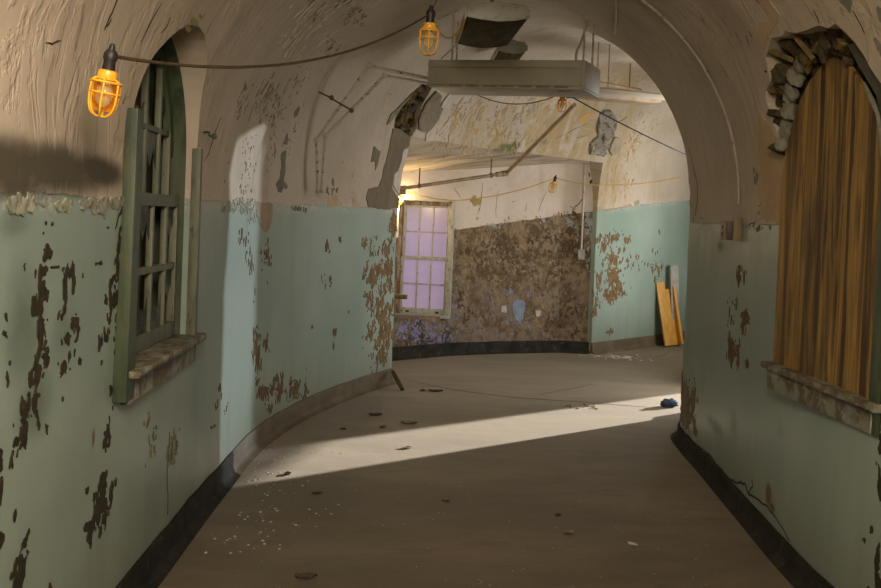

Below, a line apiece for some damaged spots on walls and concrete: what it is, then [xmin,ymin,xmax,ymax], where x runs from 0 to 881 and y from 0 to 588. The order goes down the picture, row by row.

peeling [233,66,307,193]
spalling [764,28,881,156]
spalling [6,192,124,365]
peeling [221,135,273,275]
flaking render [326,84,663,373]
peeling [0,221,84,506]
peeling [102,385,114,453]
peeling [251,324,309,414]
peeling [680,370,698,437]
peeling [9,528,30,588]
peeling [83,470,117,549]
peeling [867,542,881,588]